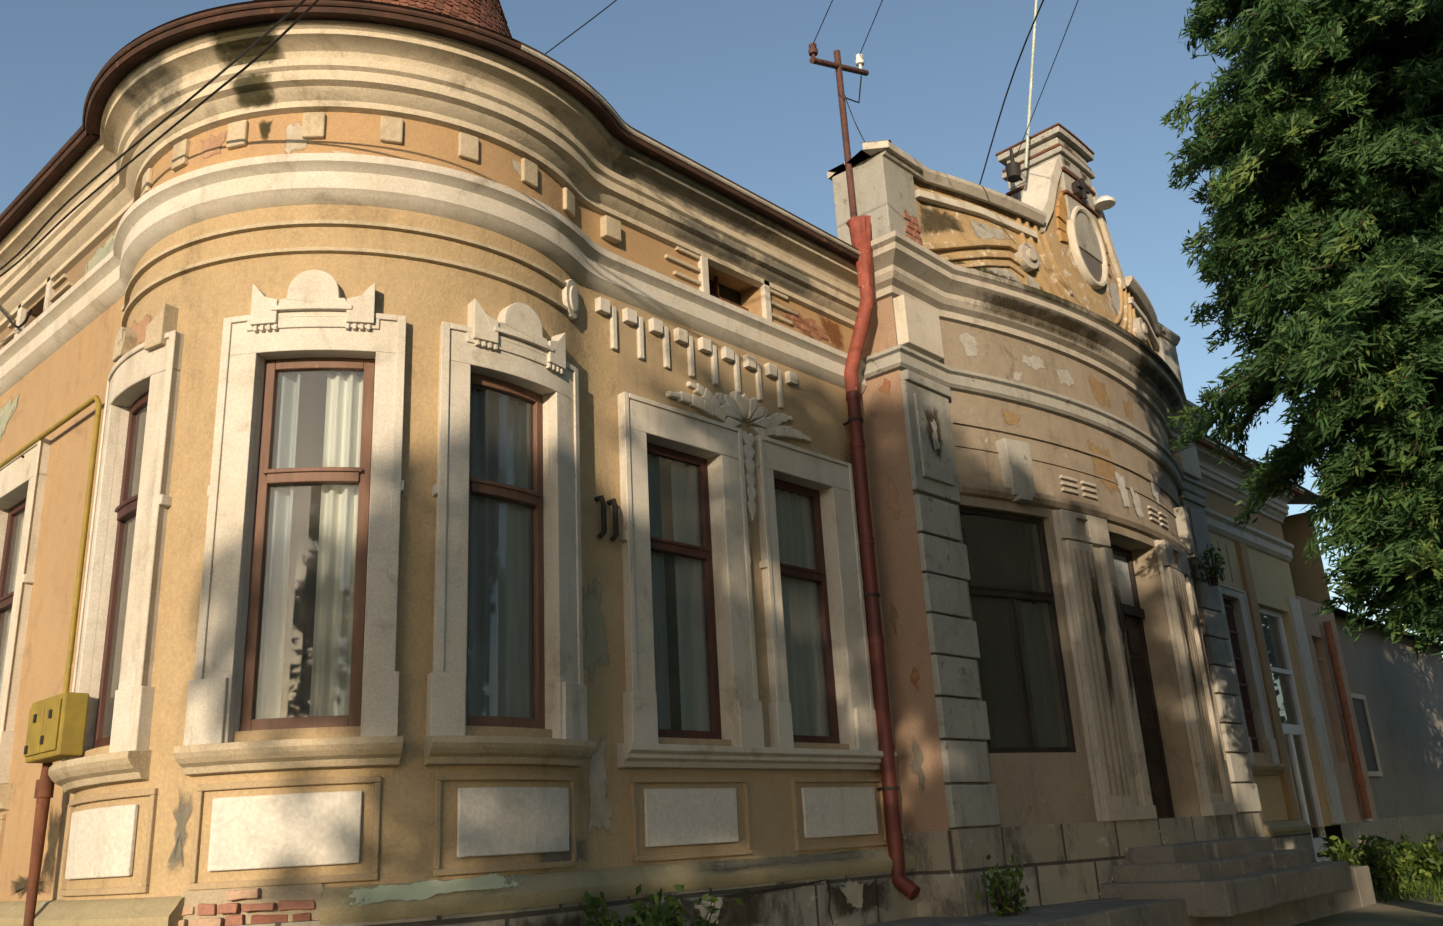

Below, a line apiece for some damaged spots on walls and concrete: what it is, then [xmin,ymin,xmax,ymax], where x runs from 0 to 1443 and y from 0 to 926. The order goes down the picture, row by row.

flaking render [903,211,923,246]
flaking render [782,308,828,341]
peeling [0,394,19,440]
water stain [1091,577,1133,705]
water stain [1179,603,1213,703]
flaking render [178,883,324,926]